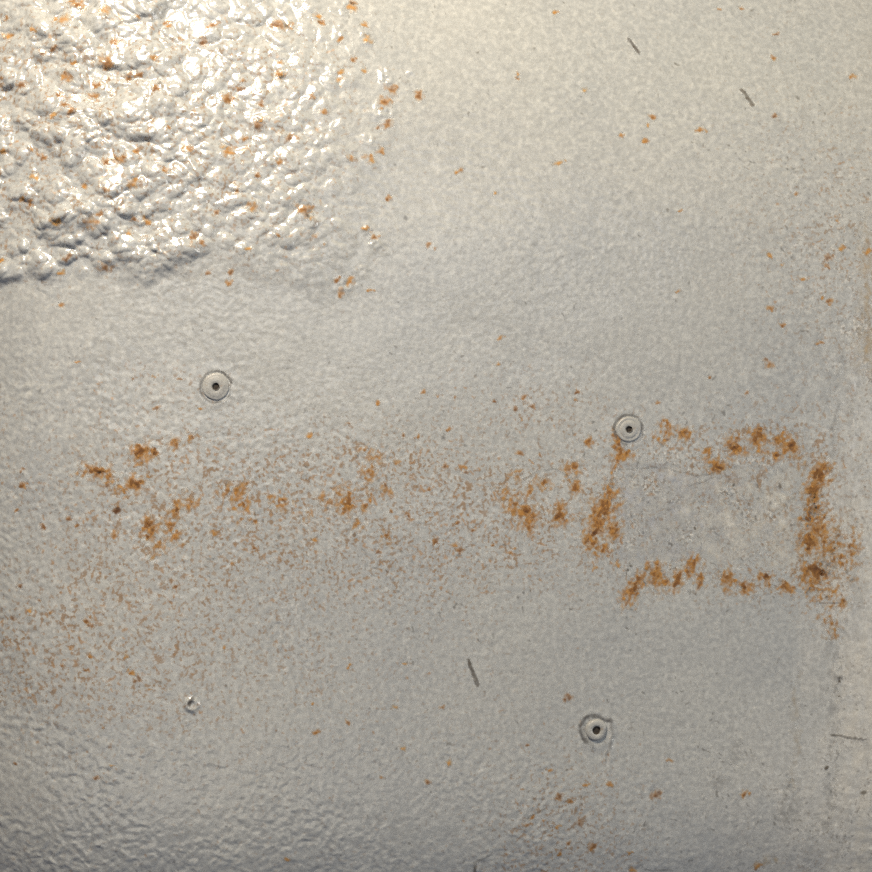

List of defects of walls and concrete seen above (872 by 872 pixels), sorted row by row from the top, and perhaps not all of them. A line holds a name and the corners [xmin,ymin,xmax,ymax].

corrosion [88,57,113,98]
corrosion [611,434,635,474]
corrosion [653,419,692,442]
corrosion [703,427,797,473]
corrosion [140,498,200,559]
corrosion [222,483,257,523]
corrosion [321,487,372,528]
corrosion [502,480,546,531]
corrosion [582,485,622,556]
corrosion [721,462,860,636]
corrosion [622,554,704,606]